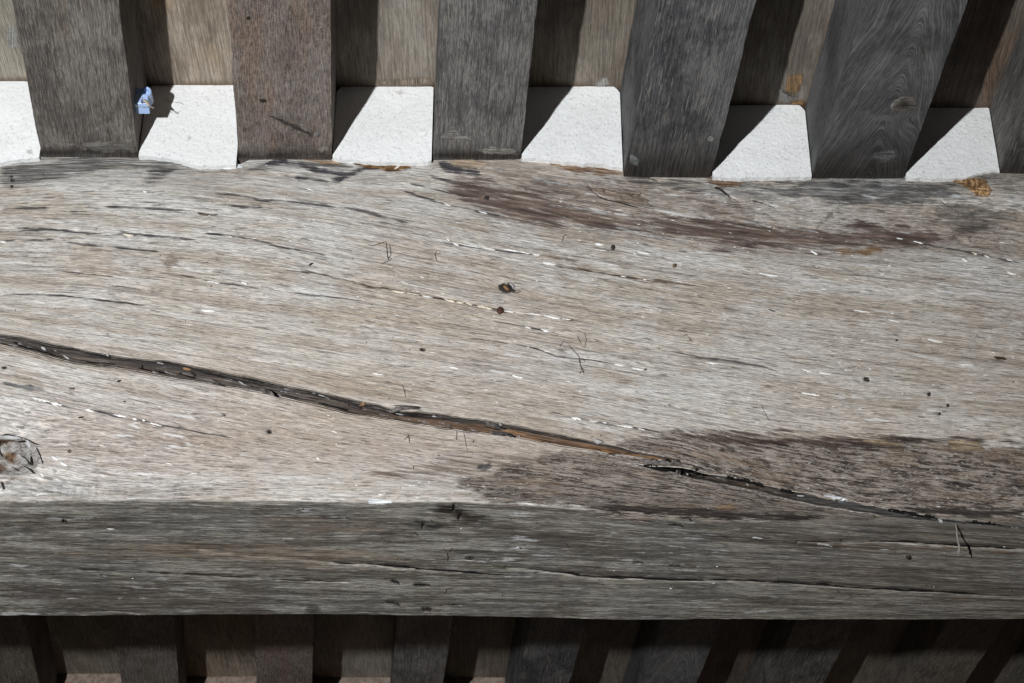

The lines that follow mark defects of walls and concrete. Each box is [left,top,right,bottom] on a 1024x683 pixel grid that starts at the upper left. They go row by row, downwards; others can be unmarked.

water stain [449,160,960,256]
crack [0,335,1024,551]
water stain [687,429,986,448]
water stain [374,455,541,480]
water stain [567,503,822,521]
water stain [903,507,1024,519]